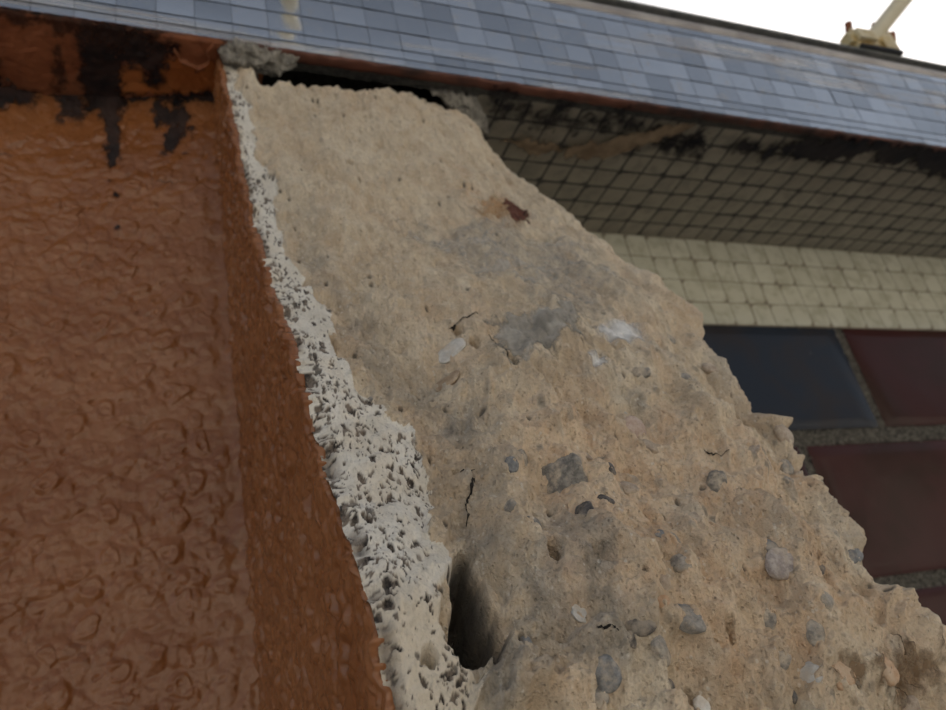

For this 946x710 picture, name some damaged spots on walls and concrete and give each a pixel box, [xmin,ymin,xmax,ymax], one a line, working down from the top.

damp [0,19,215,168]
peeling [119,42,216,96]
damp [731,134,946,189]
corrosion [479,197,530,224]
spalling [223,64,946,710]
crack [460,469,475,527]